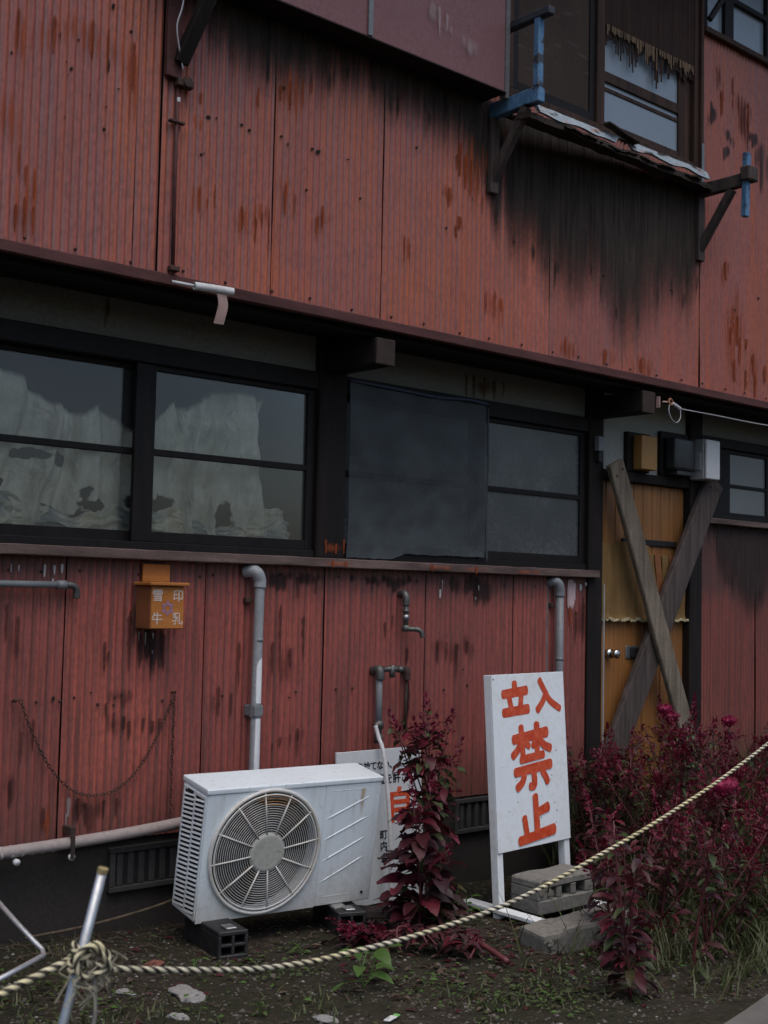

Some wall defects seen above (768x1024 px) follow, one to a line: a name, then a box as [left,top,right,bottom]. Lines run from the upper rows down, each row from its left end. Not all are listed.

rust [42,15,95,60]
rust [128,42,137,117]
rust [717,67,749,144]
rust [3,101,37,236]
rust [446,141,484,213]
rust [728,303,767,398]
damp [127,609,175,679]